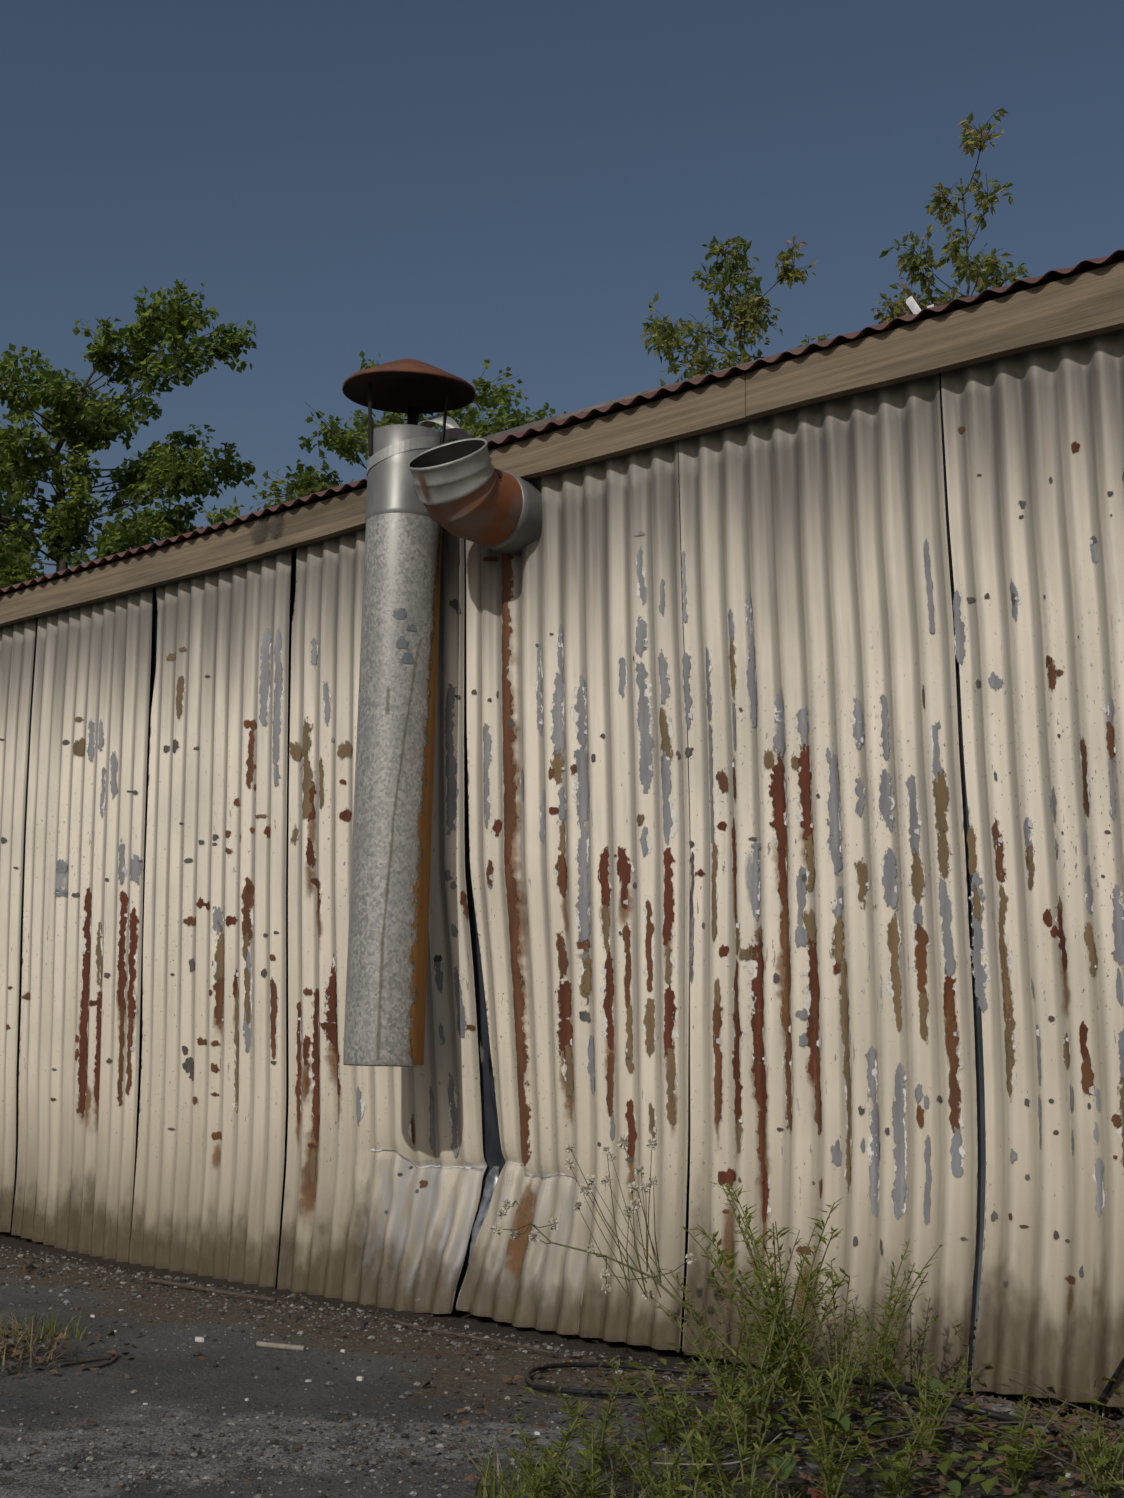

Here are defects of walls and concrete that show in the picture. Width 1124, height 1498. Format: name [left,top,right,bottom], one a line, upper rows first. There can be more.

corrosion [75,888,139,1124]
peeling [170,877,279,1104]
corrosion [295,954,340,1211]
corrosion [483,553,532,1271]
peeling [515,626,605,1094]
corrosion [597,846,637,1196]
corrosion [718,915,810,1256]
corrosion [795,909,822,1135]
peeling [618,531,1074,1224]
peeling [1080,696,1124,1006]
peeling [1111,1029,1124,1167]
leakage [0,1193,1124,1407]